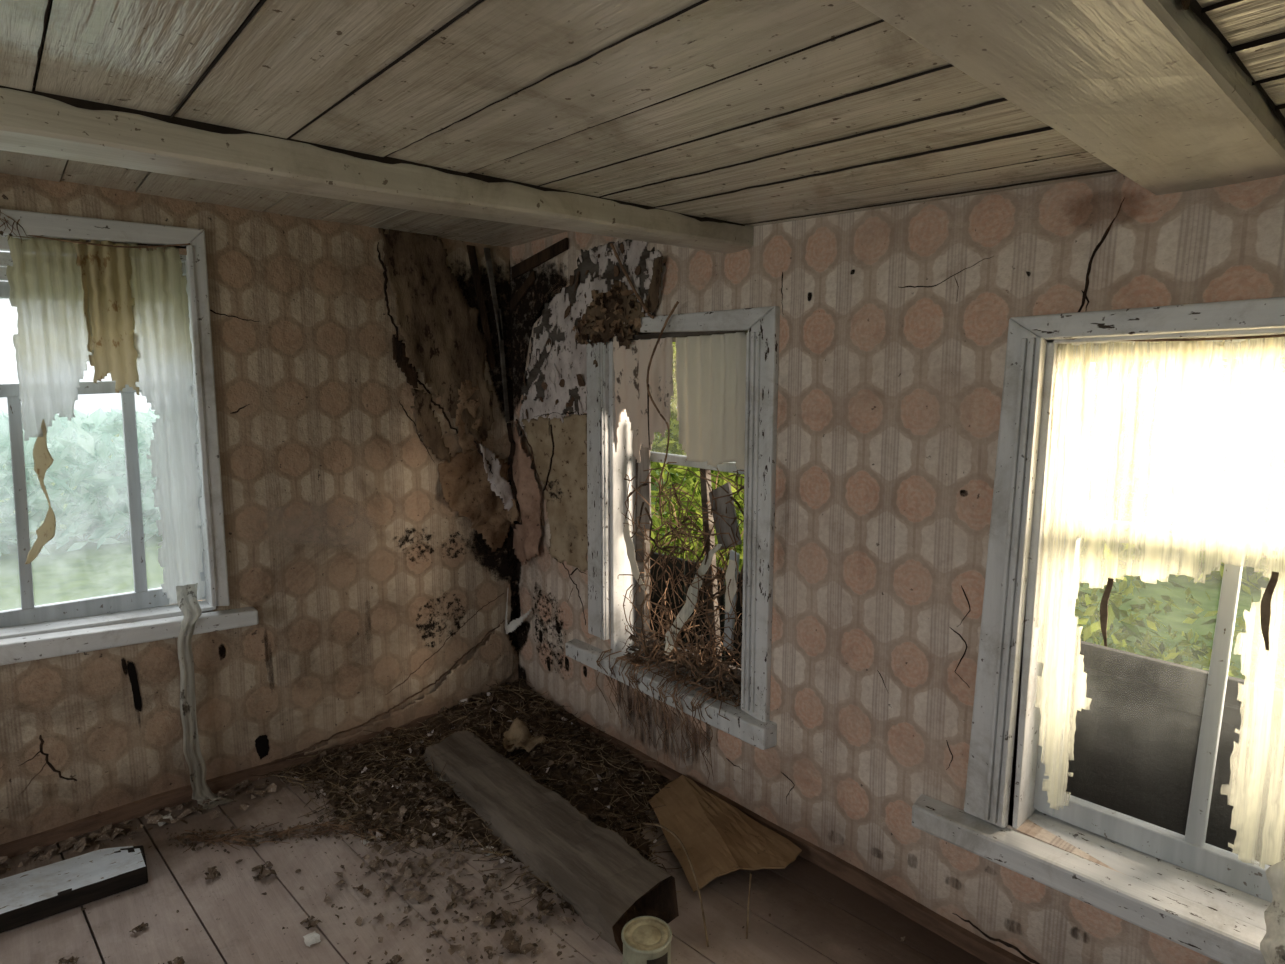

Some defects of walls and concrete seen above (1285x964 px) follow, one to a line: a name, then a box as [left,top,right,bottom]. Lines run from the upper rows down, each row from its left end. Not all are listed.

crack [1078,198,1125,312]
flaking render [455,238,666,572]
damp [394,524,566,679]
crack [0,735,77,789]
crack [952,913,1040,964]